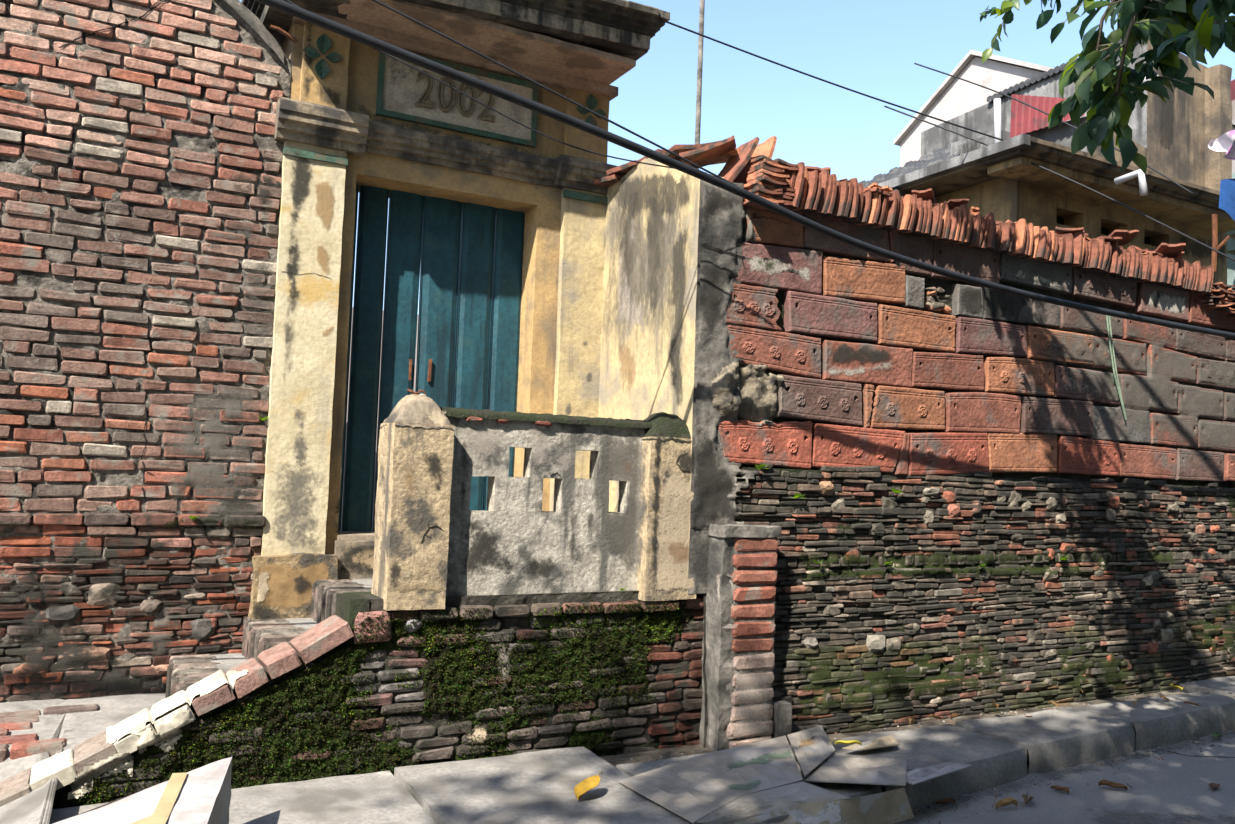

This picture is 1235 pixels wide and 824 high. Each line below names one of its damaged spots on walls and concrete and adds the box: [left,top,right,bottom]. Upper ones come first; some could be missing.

water stain [291,153,311,221]
peeling [316,182,334,229]
water stain [287,237,298,310]
peeling [317,246,329,273]
water stain [610,175,689,405]
water stain [425,454,443,489]
water stain [570,437,660,576]
flaking render [253,563,328,619]
water stain [391,565,401,586]
crack [421,522,443,543]
water stain [463,522,510,572]
water stain [529,559,554,576]